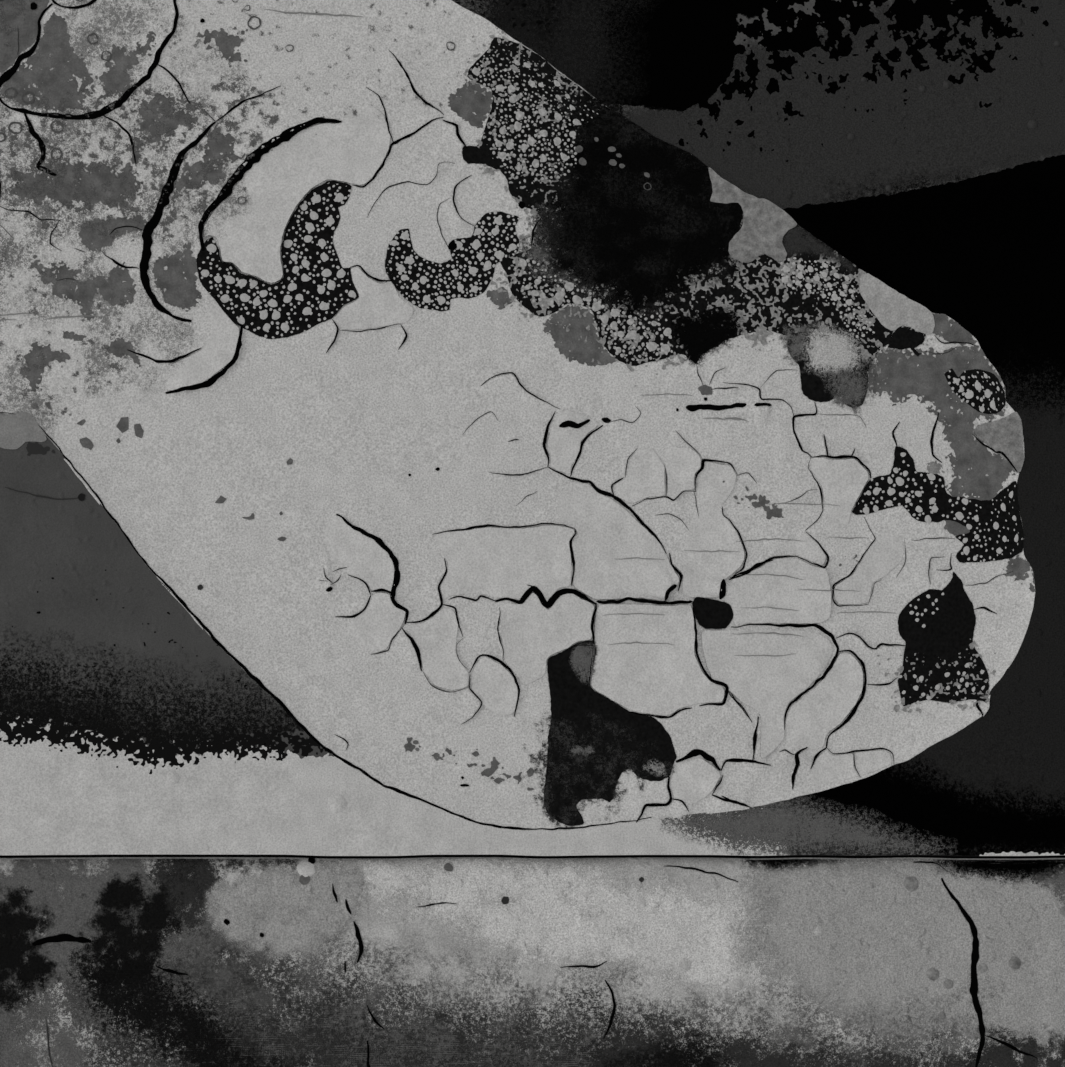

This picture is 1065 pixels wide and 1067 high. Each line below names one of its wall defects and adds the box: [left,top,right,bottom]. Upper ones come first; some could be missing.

peeling [0,412,47,449]
crack [0,0,280,322]
crack [128,325,243,394]
crack [198,117,342,251]
crack [353,50,474,250]
peeling [163,30,935,413]
peeling [324,411,904,829]
crack [320,368,1017,823]
water stain [584,0,1065,856]
peeling [810,369,1024,715]
water stain [0,859,1065,1067]
crack [914,861,1036,1067]